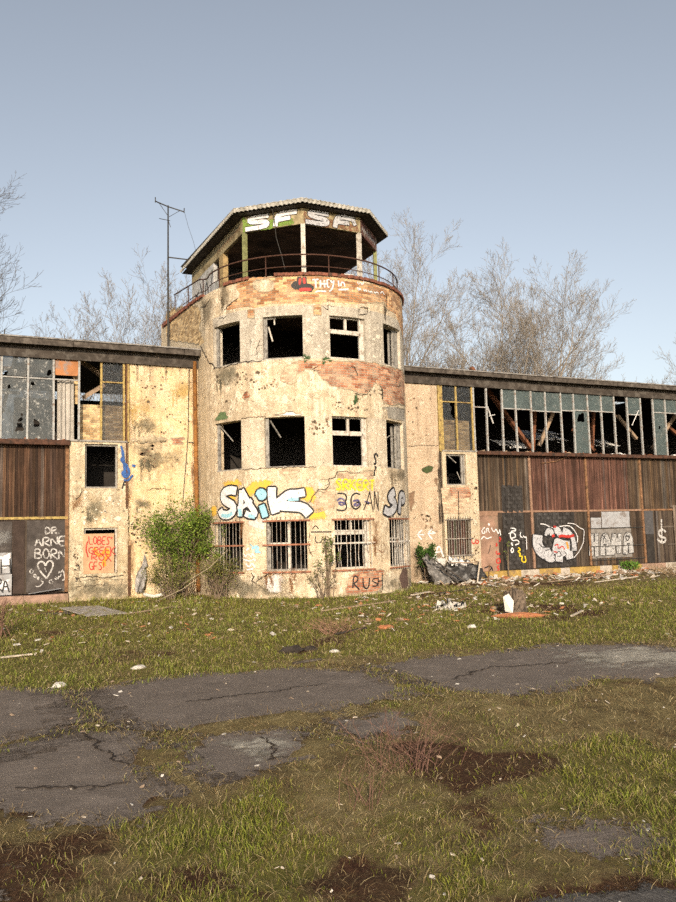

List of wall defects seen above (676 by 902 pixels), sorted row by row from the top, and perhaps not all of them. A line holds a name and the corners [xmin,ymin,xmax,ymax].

flaking render [215,275,421,436]
damp [140,448,172,468]
flaking render [312,447,387,513]
flaking render [408,491,435,533]
flaking render [422,466,478,524]